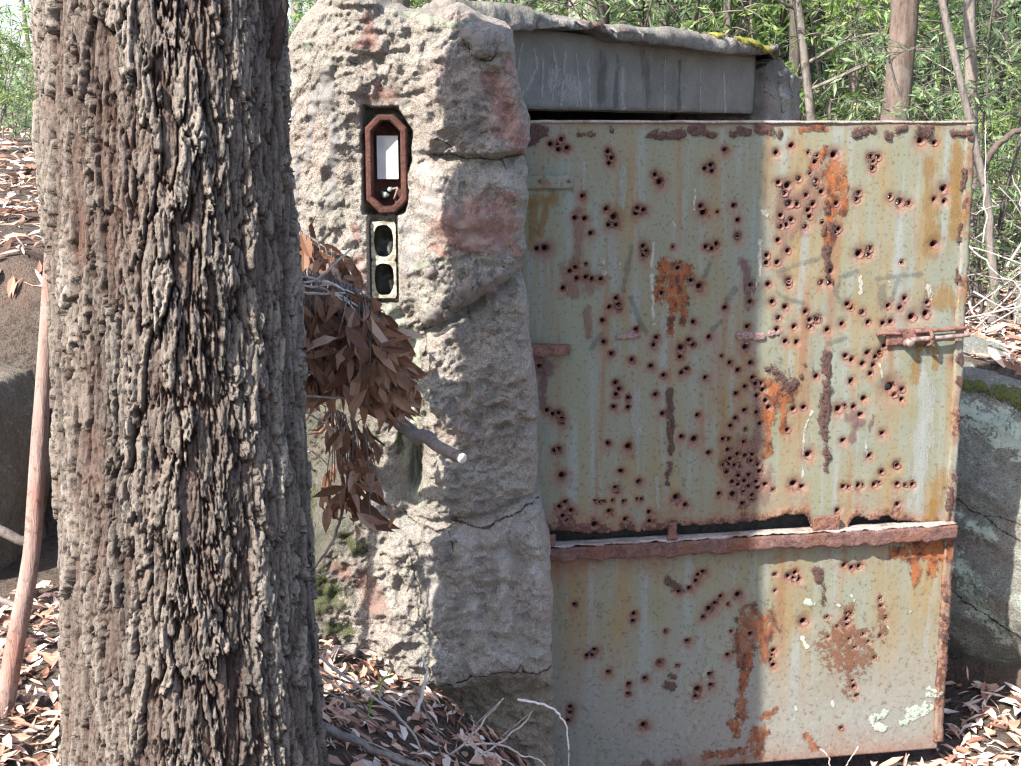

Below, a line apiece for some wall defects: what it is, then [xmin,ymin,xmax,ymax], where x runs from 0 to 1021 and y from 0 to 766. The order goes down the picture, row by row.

rust [528,124,550,147]
rust [646,124,783,140]
rust [798,123,828,133]
rust [776,145,850,285]
rust [950,128,975,243]
rust [651,256,695,338]
rust [727,348,834,504]
crack [402,496,539,641]
rust [811,566,826,605]
rust [702,603,781,760]
rust [814,595,888,698]
rust [802,732,820,751]